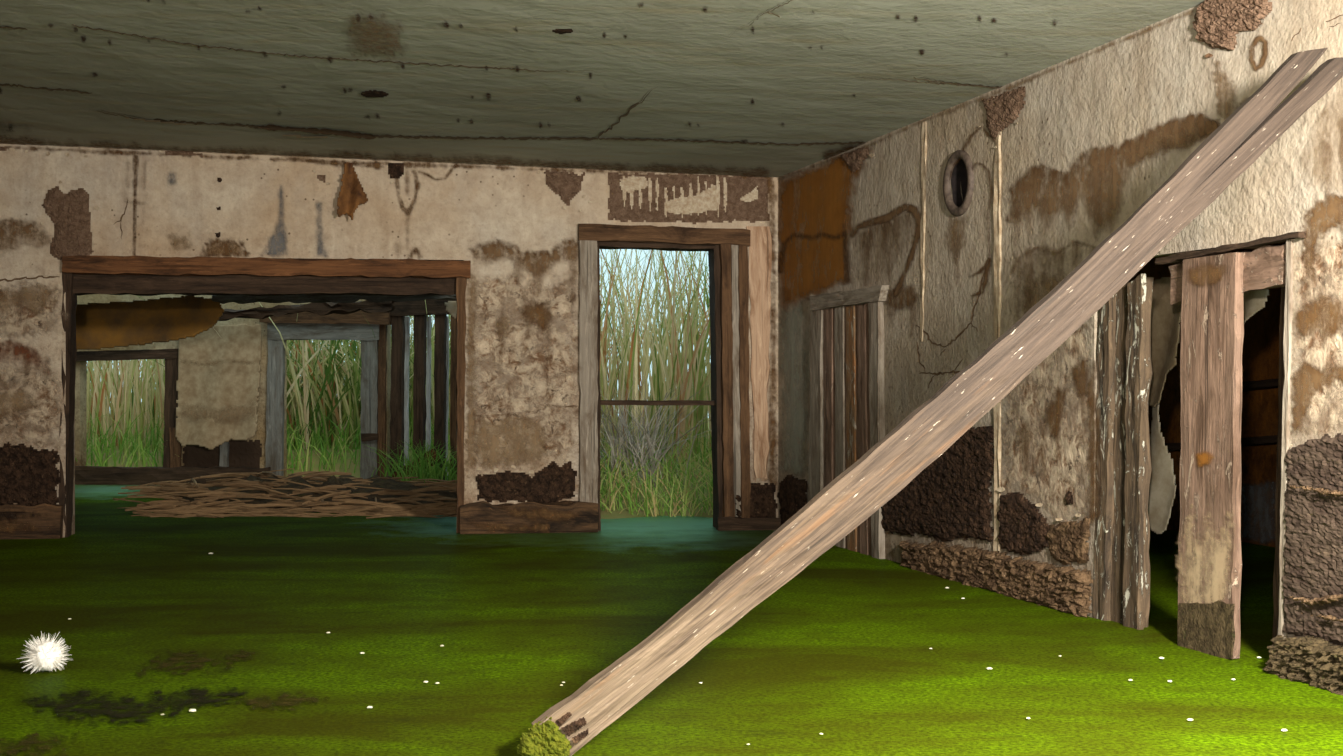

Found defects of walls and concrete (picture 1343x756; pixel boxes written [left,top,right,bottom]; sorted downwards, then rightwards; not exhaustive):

flaking render [1192,0,1272,58]
flaking render [41,180,99,261]
damp [0,137,921,309]
damp [949,127,993,219]
damp [1007,61,1248,227]
flaking render [0,366,61,506]
flaking render [467,273,580,503]
flaking render [537,170,808,525]
crack [916,257,989,388]
flaking render [881,324,1093,618]
flaking render [1241,241,1343,696]
damp [1296,296,1343,336]